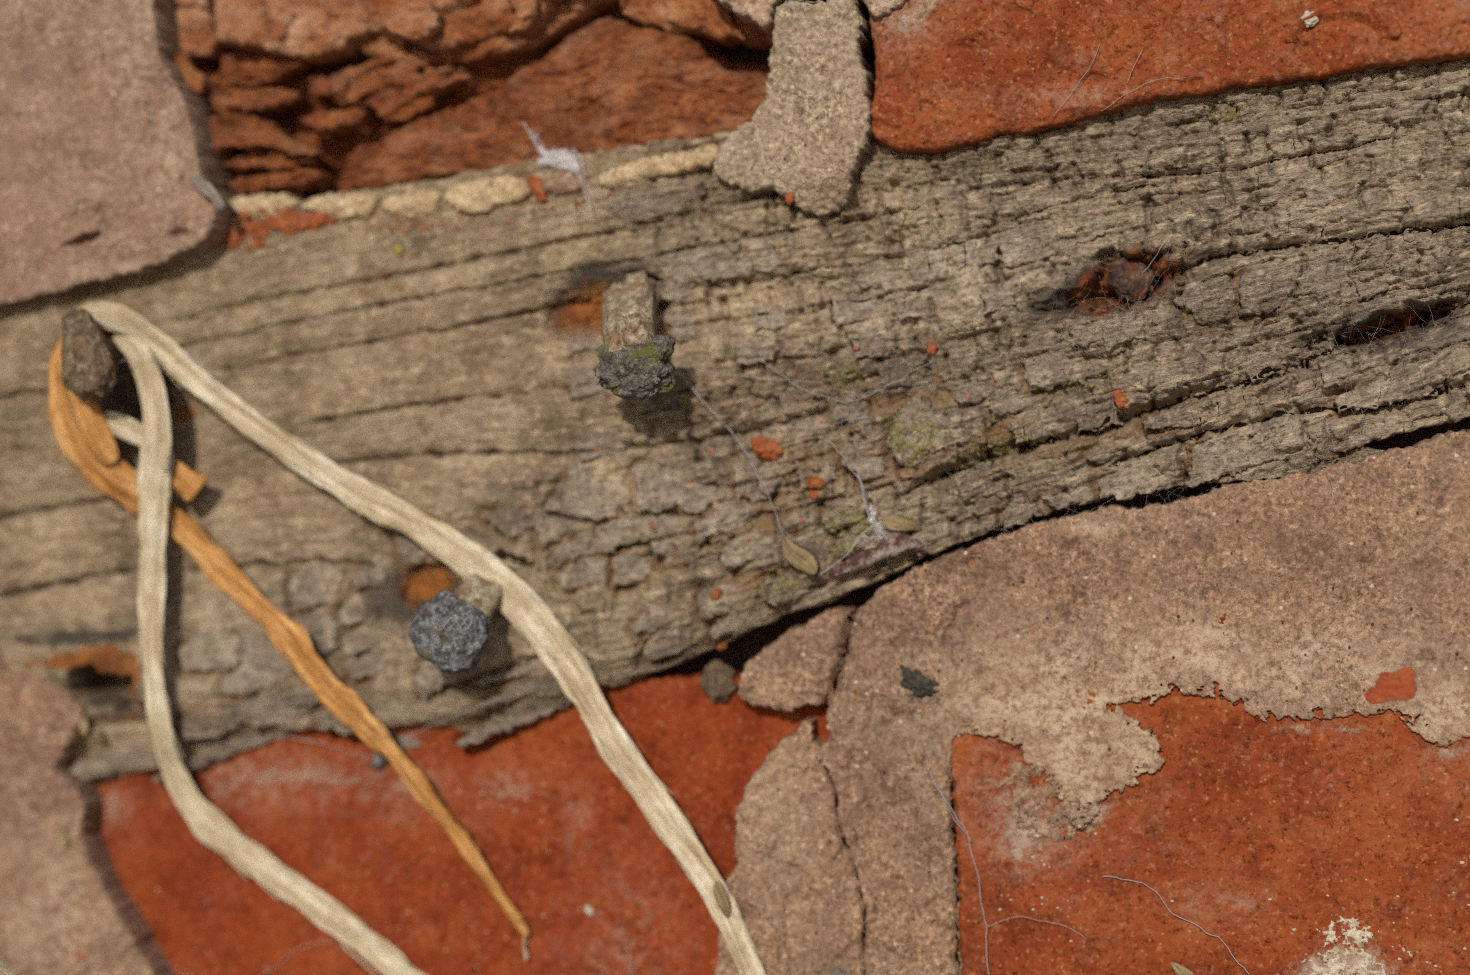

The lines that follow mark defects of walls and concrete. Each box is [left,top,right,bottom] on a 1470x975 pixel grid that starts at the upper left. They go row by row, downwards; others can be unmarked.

crack [827,603,863,704]
peeling [1365,667,1416,704]
crack [814,754,867,975]
peeling [1316,914,1374,948]
water stain [1302,947,1386,975]